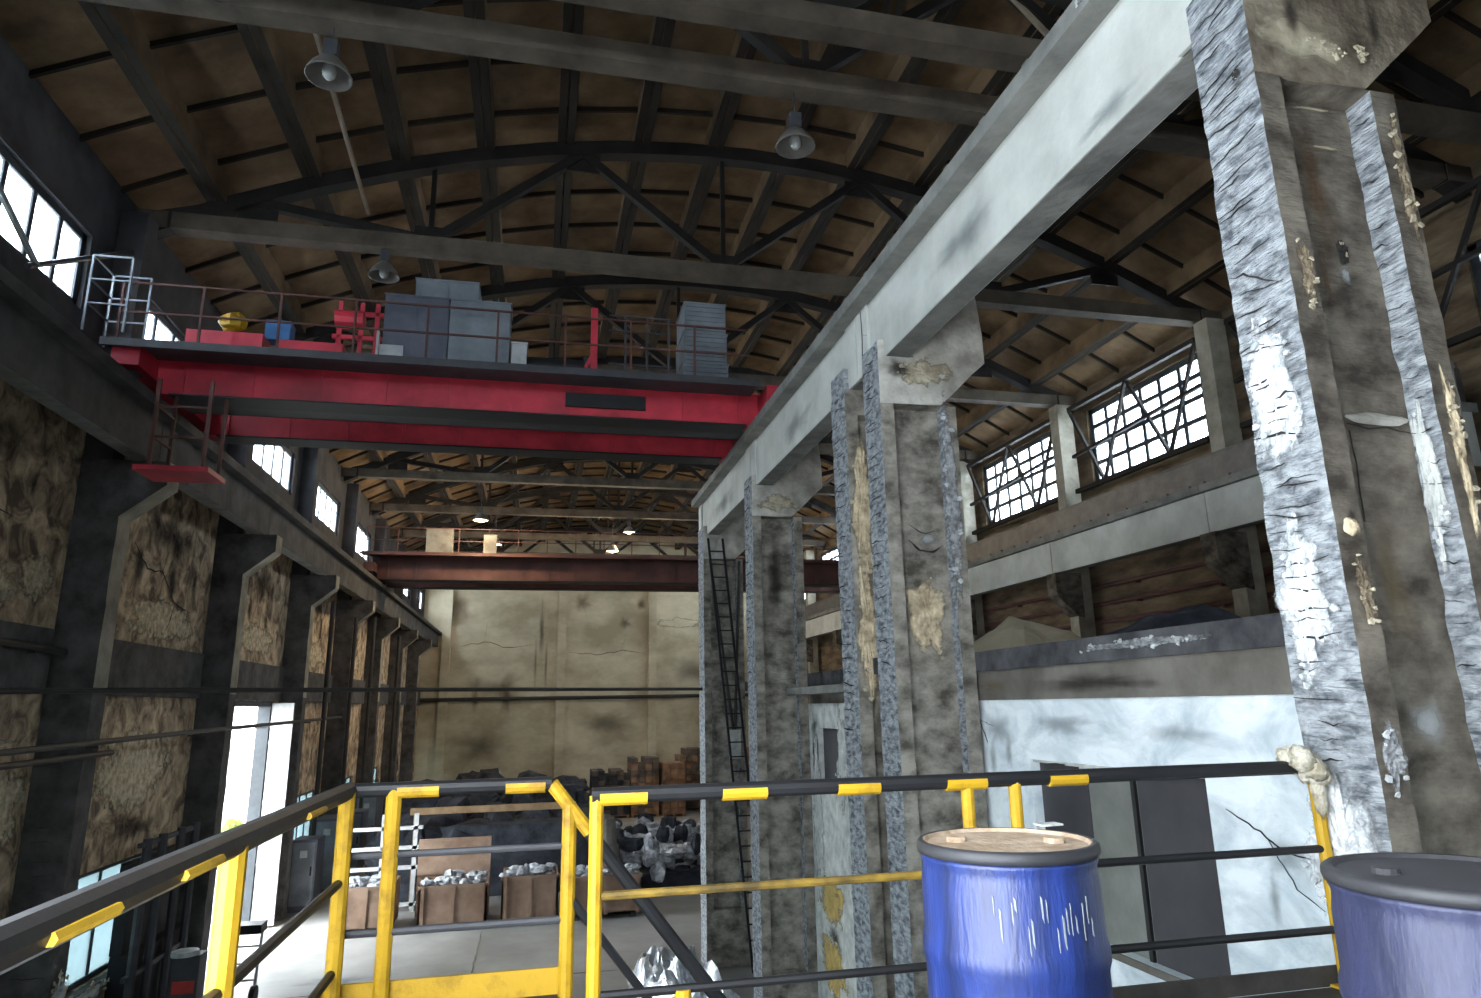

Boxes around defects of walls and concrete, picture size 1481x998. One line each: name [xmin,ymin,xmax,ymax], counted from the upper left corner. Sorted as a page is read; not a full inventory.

peeling [1306,36,1369,63]
peeling [896,357,963,660]
crack [1192,0,1343,762]
crack [1226,809,1325,912]